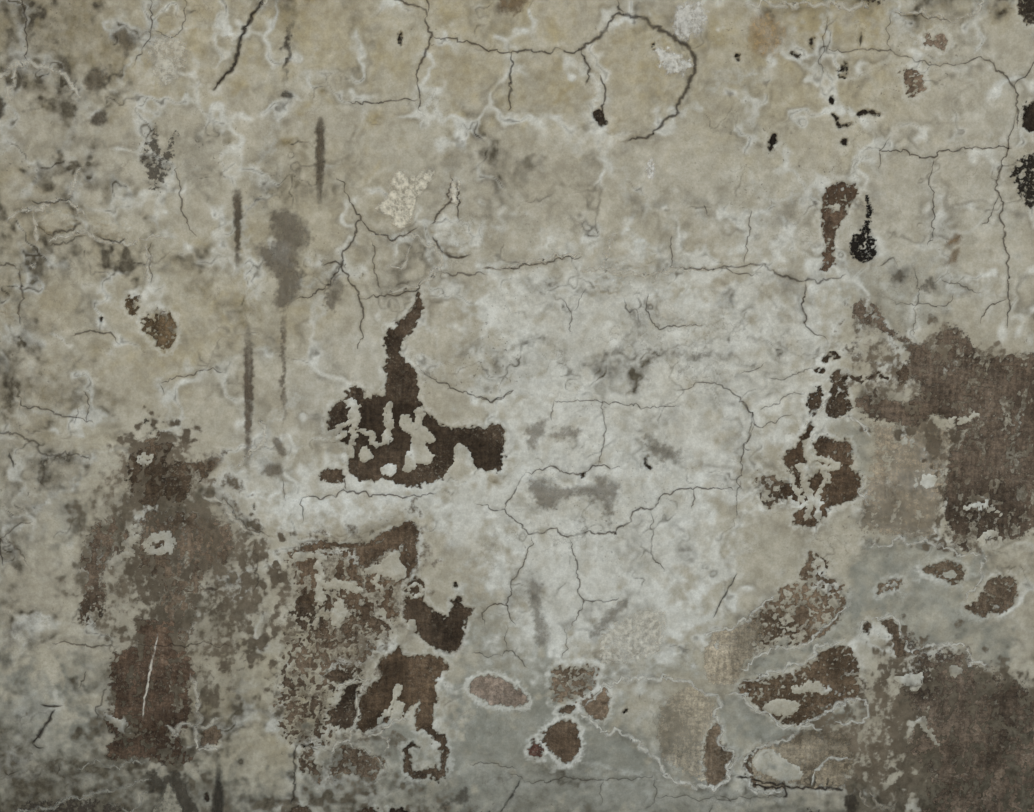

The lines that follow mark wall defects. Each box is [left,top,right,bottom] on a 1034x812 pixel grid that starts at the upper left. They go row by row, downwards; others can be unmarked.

leakage [113,30,133,55]
crack [214,0,263,90]
crack [352,0,696,140]
leakage [749,0,881,12]
crack [302,178,578,349]
spalling [314,288,511,492]
crack [479,366,807,666]
spalling [747,300,1034,624]
spalling [273,520,479,790]
spalling [697,551,1034,812]
leakage [860,614,986,667]
leakage [844,792,894,812]